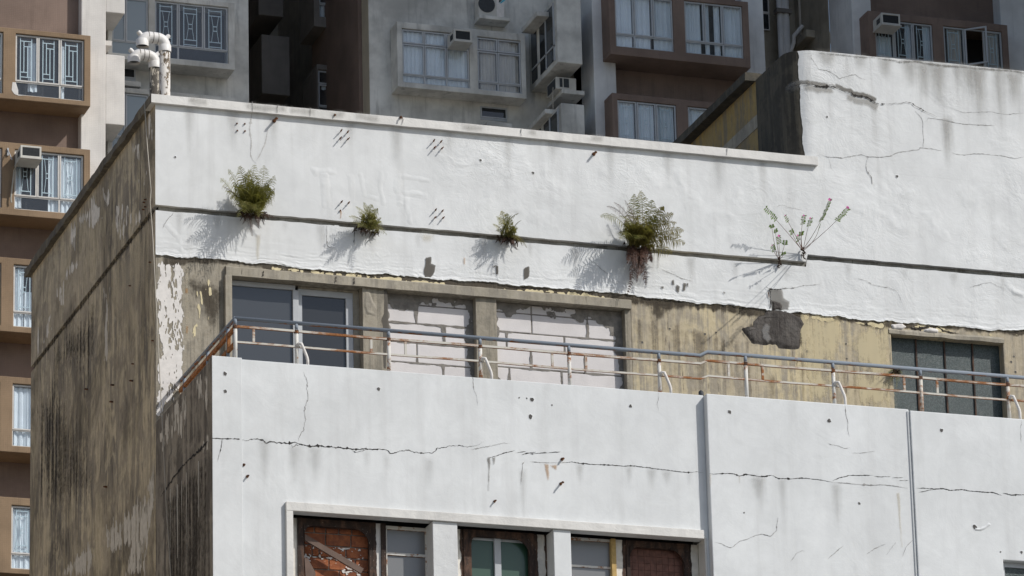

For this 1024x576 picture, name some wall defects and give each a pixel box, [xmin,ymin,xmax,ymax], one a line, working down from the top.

crack [785,58,1021,184]
peeling [156,262,212,452]
leakage [41,399,87,507]
crack [161,374,1024,496]
leakage [168,467,206,576]